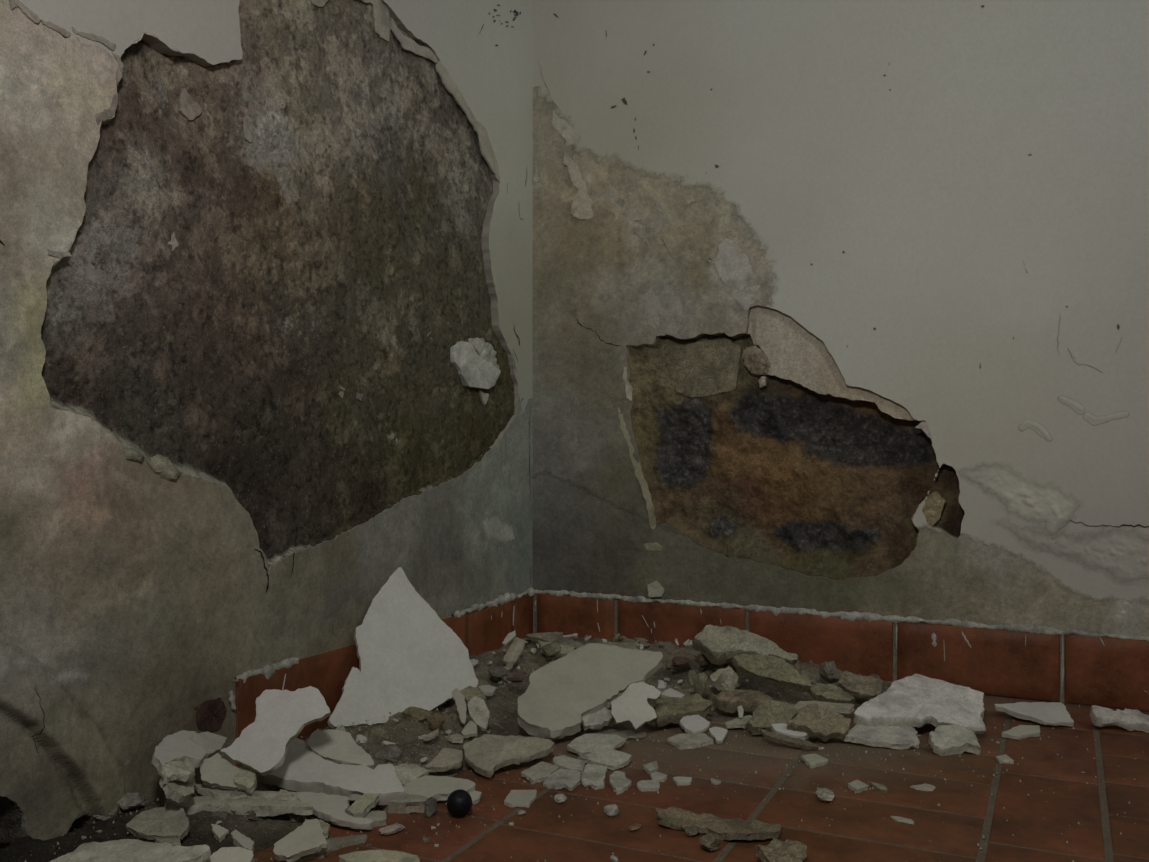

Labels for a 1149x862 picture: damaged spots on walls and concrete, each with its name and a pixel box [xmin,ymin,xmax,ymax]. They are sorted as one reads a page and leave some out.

spalling [0,0,965,805]
crack [1059,520,1149,530]
peeling [0,707,96,848]
spalling [504,755,667,816]
spalling [211,824,229,843]
spalling [379,823,405,835]